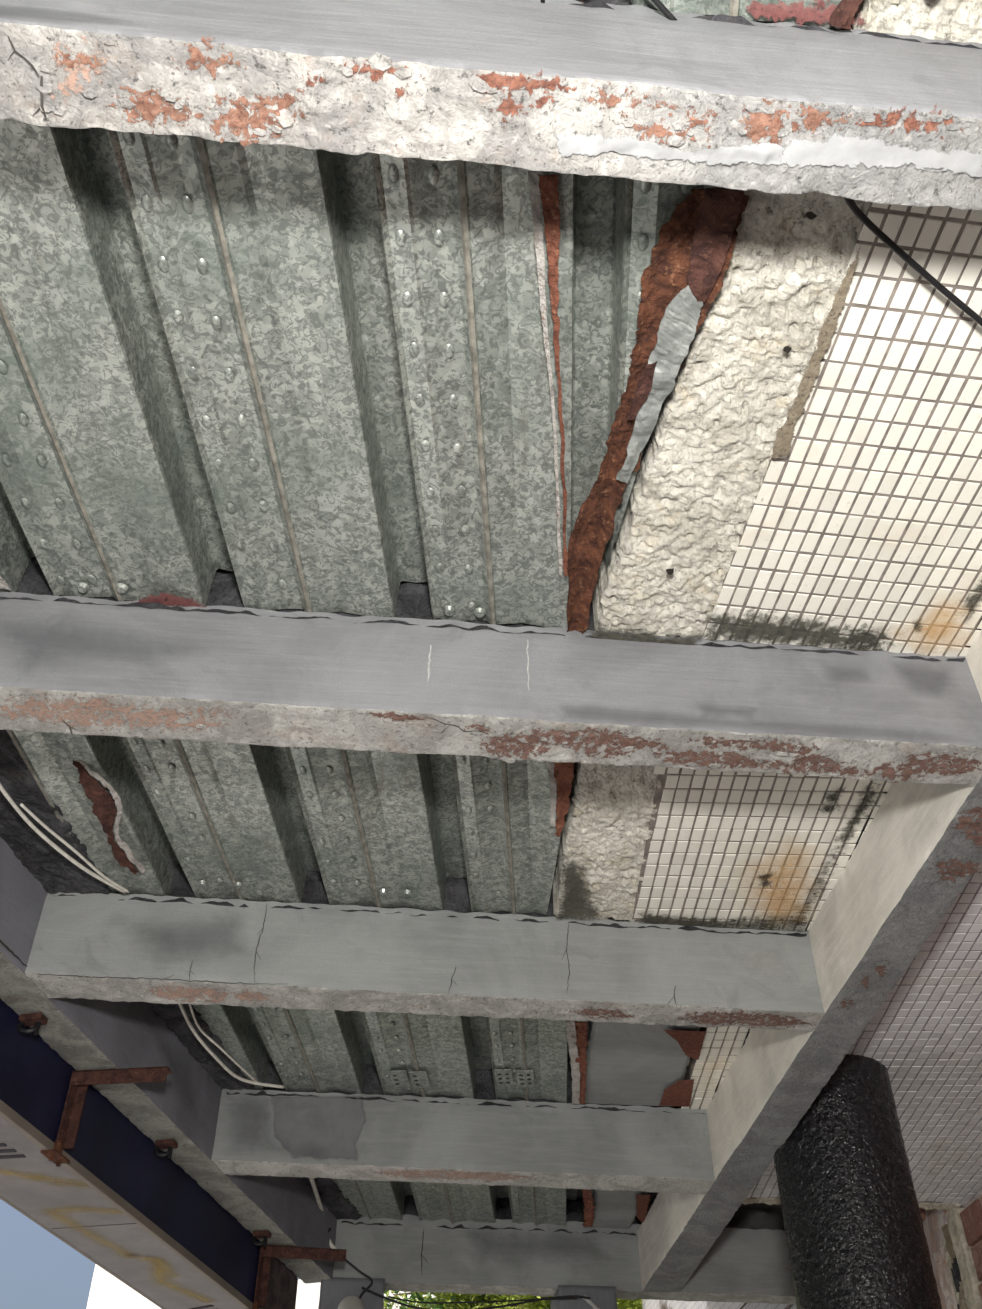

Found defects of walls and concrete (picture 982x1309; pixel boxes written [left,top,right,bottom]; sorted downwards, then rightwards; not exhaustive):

corrosion [746,0,868,30]
corrosion [54,34,427,147]
corrosion [468,71,718,149]
corrosion [738,97,978,146]
corrosion [528,171,749,635]
water stain [964,581,982,620]
corrosion [72,759,146,874]
corrosion [462,723,982,837]
water stain [640,784,879,932]
corrosion [928,807,982,884]